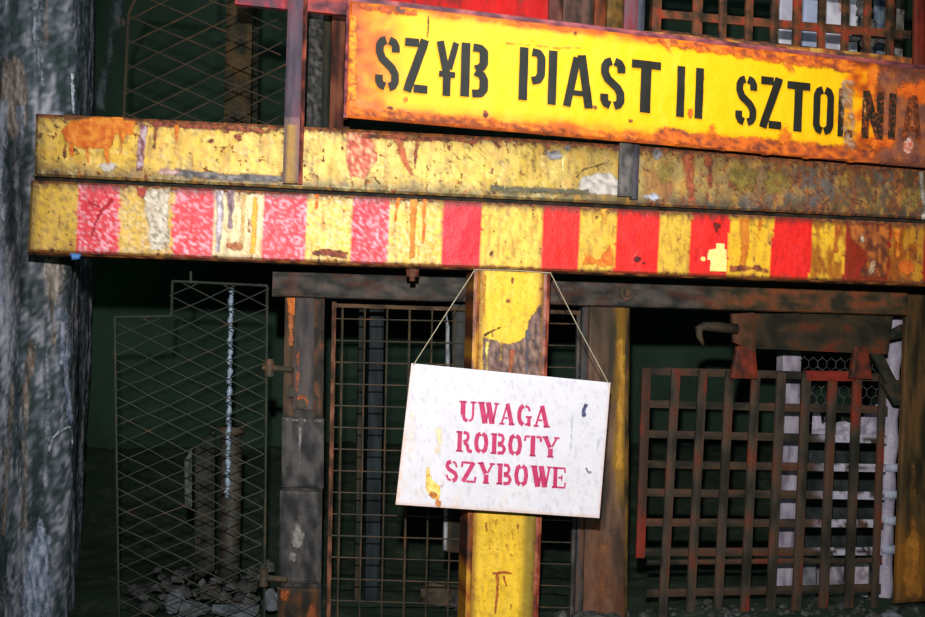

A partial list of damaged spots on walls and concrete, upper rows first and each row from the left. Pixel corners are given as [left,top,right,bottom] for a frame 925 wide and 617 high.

rust [346,1,925,202]
rust [61,117,135,165]
rust [151,121,271,143]
spalling [547,145,571,159]
spalling [578,173,618,195]
peeling [701,243,727,272]
rust [833,222,915,278]
rust [287,297,308,405]
peeling [482,306,542,376]